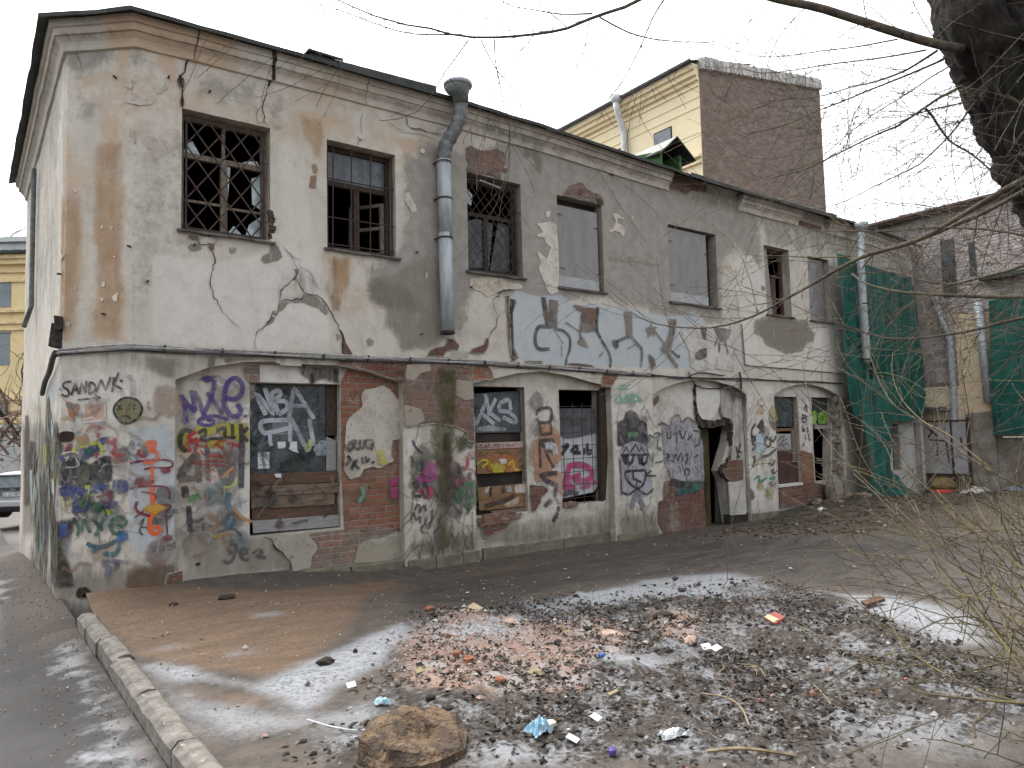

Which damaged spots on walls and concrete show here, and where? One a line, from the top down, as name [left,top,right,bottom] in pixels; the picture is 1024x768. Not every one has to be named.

crack [177,30,200,107]
crack [256,51,278,126]
spalling [466,145,509,178]
spalling [564,182,634,236]
peeling [537,211,559,294]
crack [189,235,352,354]
peeling [338,337,494,479]
leakage [444,437,467,488]
peeling [272,534,317,571]